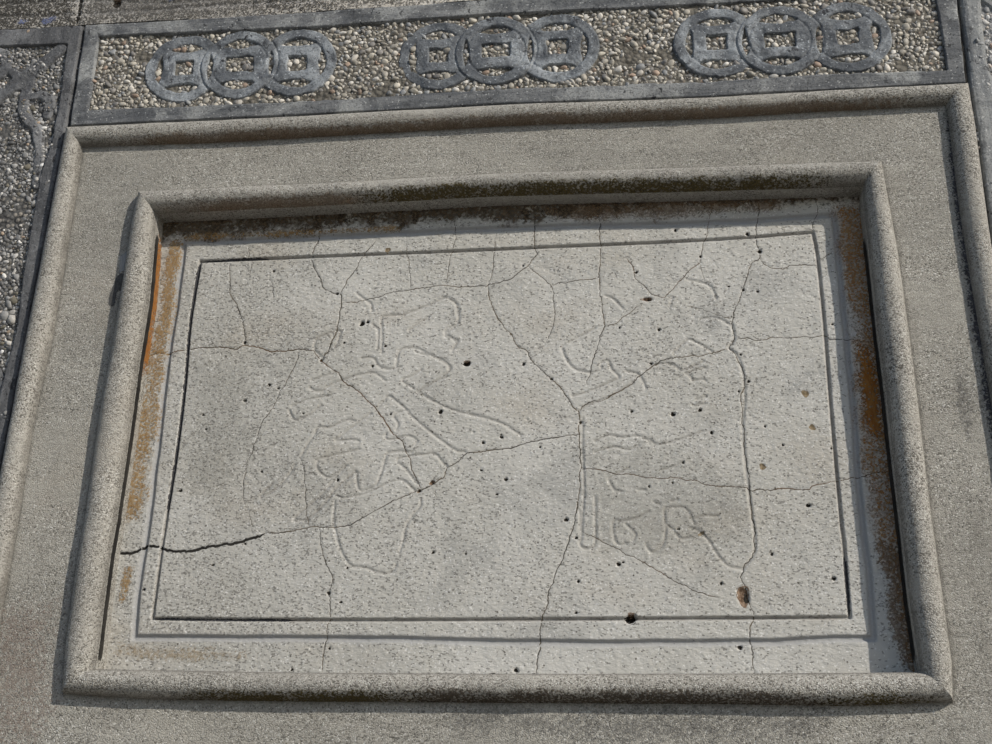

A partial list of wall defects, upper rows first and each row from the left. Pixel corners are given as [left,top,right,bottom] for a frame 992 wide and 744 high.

corrosion [119,566,132,602]
corrosion [126,226,400,520]
crack [99,203,914,674]
corrosion [834,205,915,672]